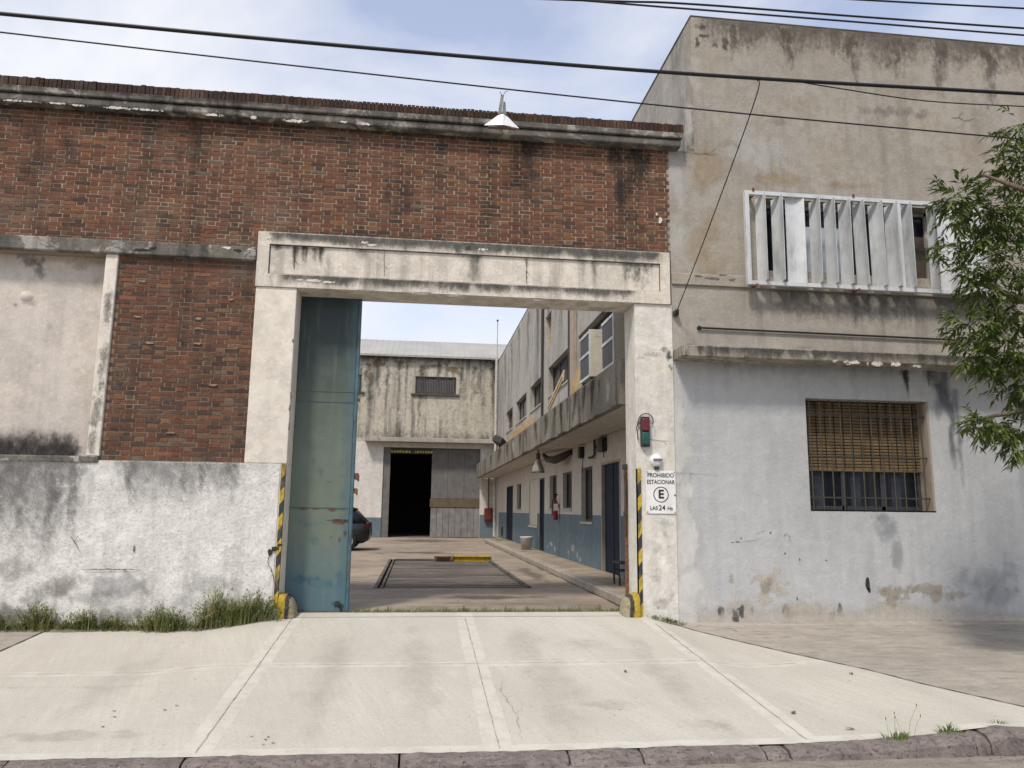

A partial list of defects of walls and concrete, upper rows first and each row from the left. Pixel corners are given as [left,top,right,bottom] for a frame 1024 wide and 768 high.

leakage [696,18,1024,80]
leakage [271,232,659,275]
leakage [283,275,632,297]
leakage [361,355,506,408]
leakage [698,346,999,453]
peeling [833,359,921,368]
leakage [0,461,81,527]
leakage [116,460,238,496]
peeling [752,568,798,605]
peeling [868,583,943,612]